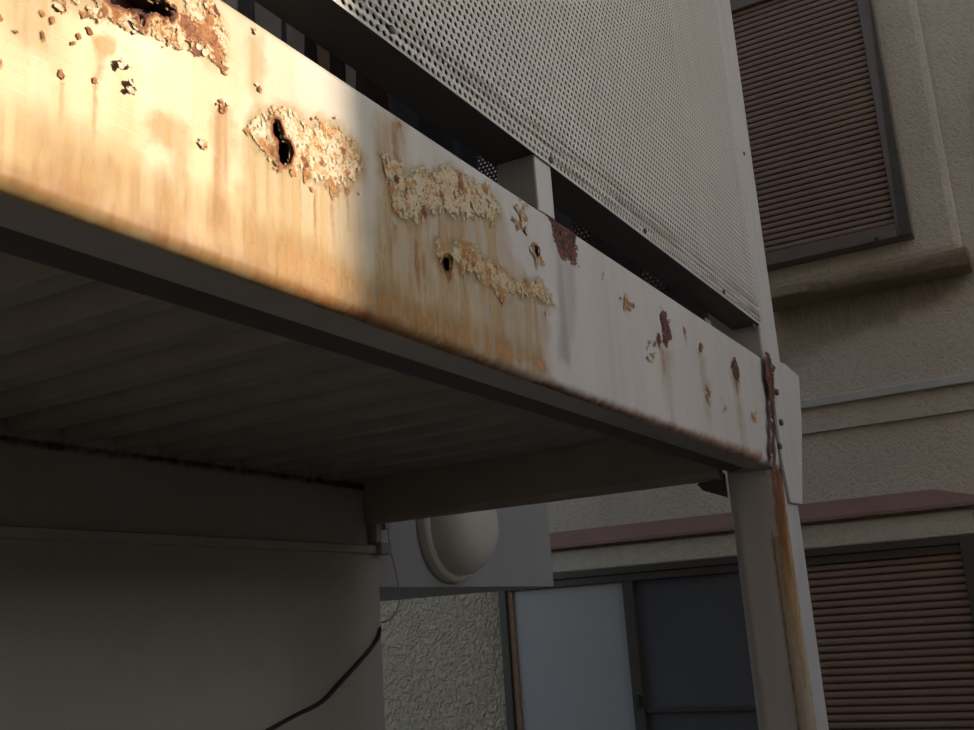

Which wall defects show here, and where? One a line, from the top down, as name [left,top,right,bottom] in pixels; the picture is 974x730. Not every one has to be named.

peeling [54,0,232,76]
rust [198,98,230,183]
peeling [244,105,363,212]
peeling [380,151,501,232]
peeling [435,197,556,315]
rust [523,200,579,266]
rust [277,278,695,436]
rust [731,357,740,381]
rust [772,470,814,730]